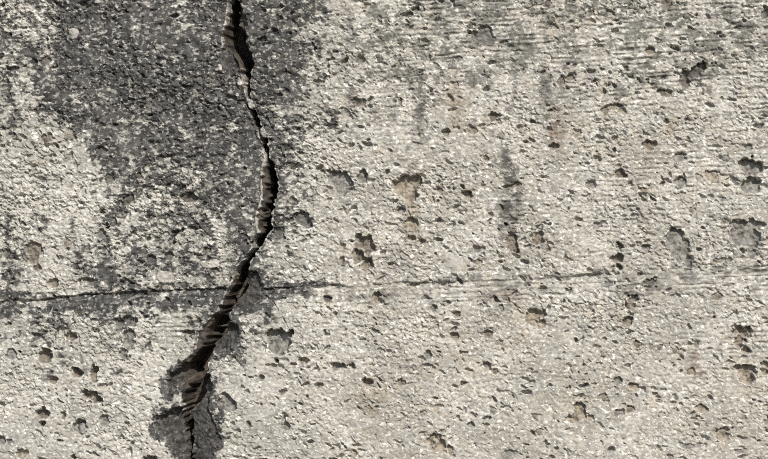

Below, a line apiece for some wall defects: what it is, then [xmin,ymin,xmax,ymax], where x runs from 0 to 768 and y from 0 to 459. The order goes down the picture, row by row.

damp [0,0,337,459]
crack [154,0,279,459]